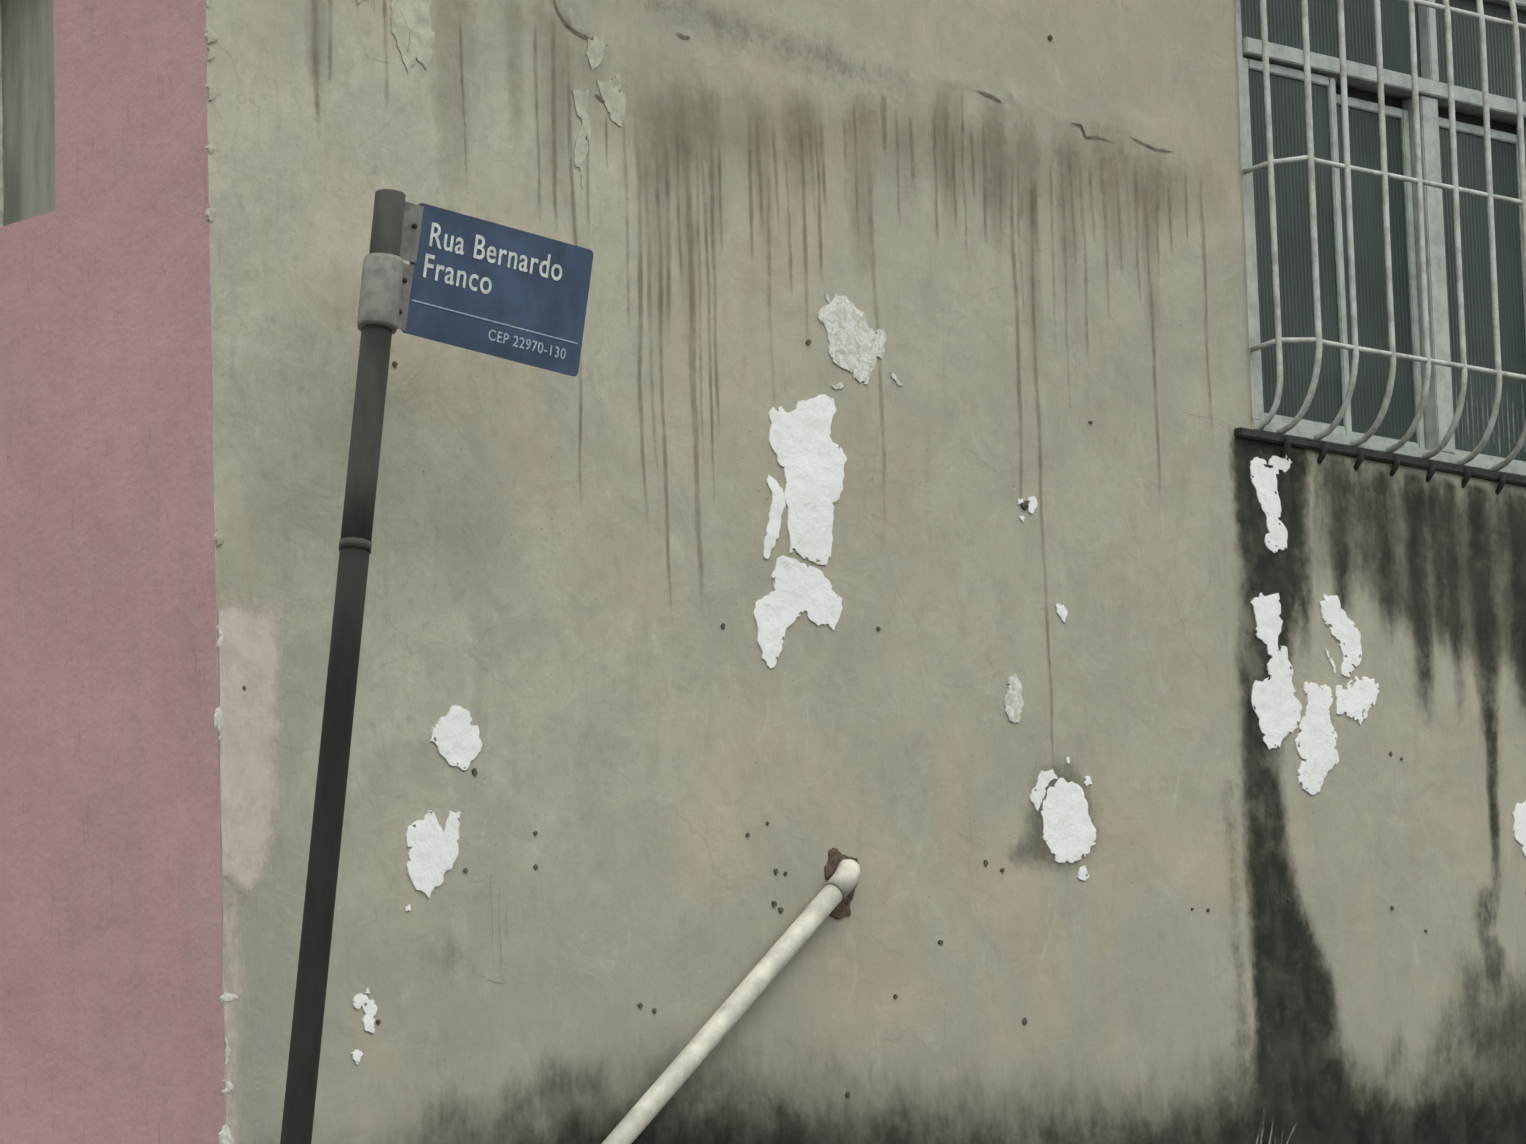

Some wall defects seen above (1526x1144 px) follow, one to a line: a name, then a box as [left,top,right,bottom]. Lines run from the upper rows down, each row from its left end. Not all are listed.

crack [554,0,609,46]
peeling [753,293,903,669]
peeling [1250,455,1292,553]
peeling [430,705,482,775]
peeling [1250,593,1379,795]
peeling [404,810,468,912]
peeling [1018,757,1096,881]
damp [1123,440,1526,1144]
peeling [1512,801,1526,857]
peeling [353,988,381,1034]
damp [556,1112,618,1144]
damp [632,1099,1002,1144]